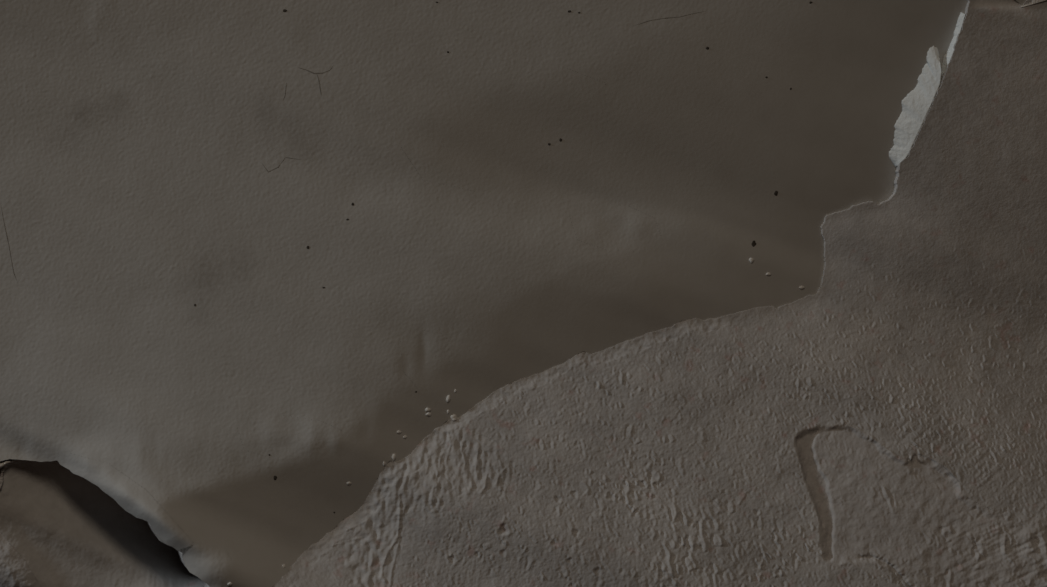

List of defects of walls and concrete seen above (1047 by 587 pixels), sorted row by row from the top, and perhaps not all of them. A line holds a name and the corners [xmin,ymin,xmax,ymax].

peeling [941,12,965,76]
flaking render [0,454,197,587]
flaking render [183,543,233,587]
flaking render [357,422,512,587]